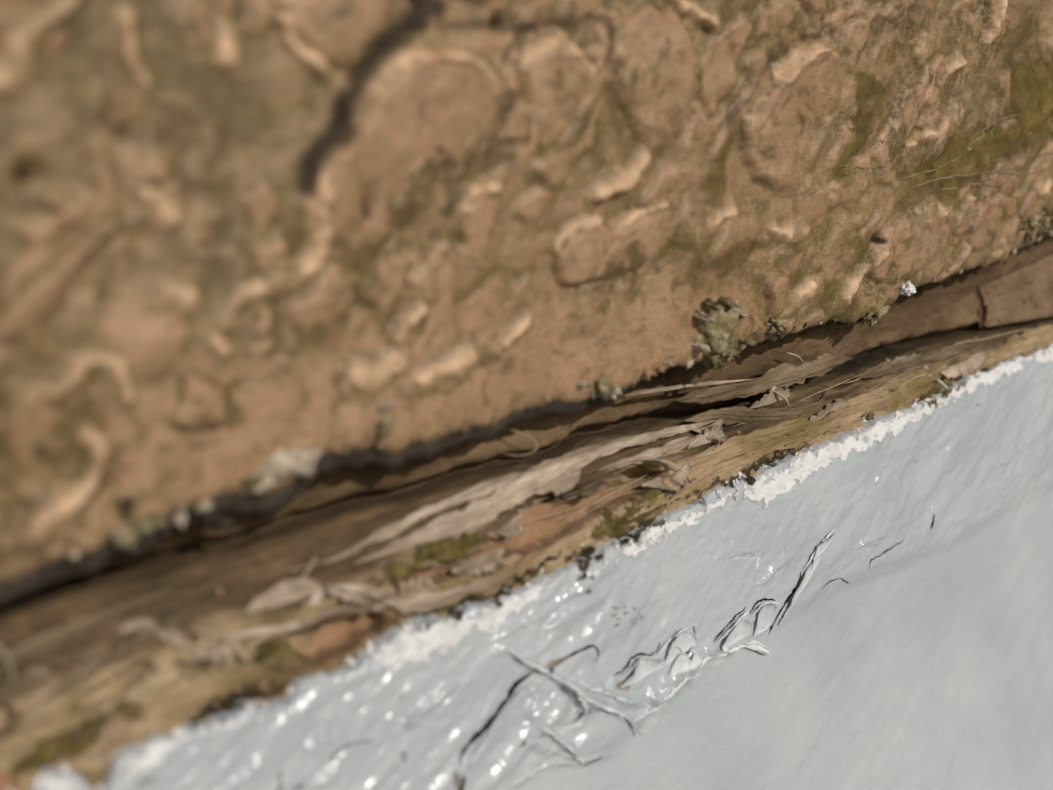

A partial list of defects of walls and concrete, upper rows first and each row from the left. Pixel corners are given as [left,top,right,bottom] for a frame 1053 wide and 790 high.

crack [460,645,599,790]